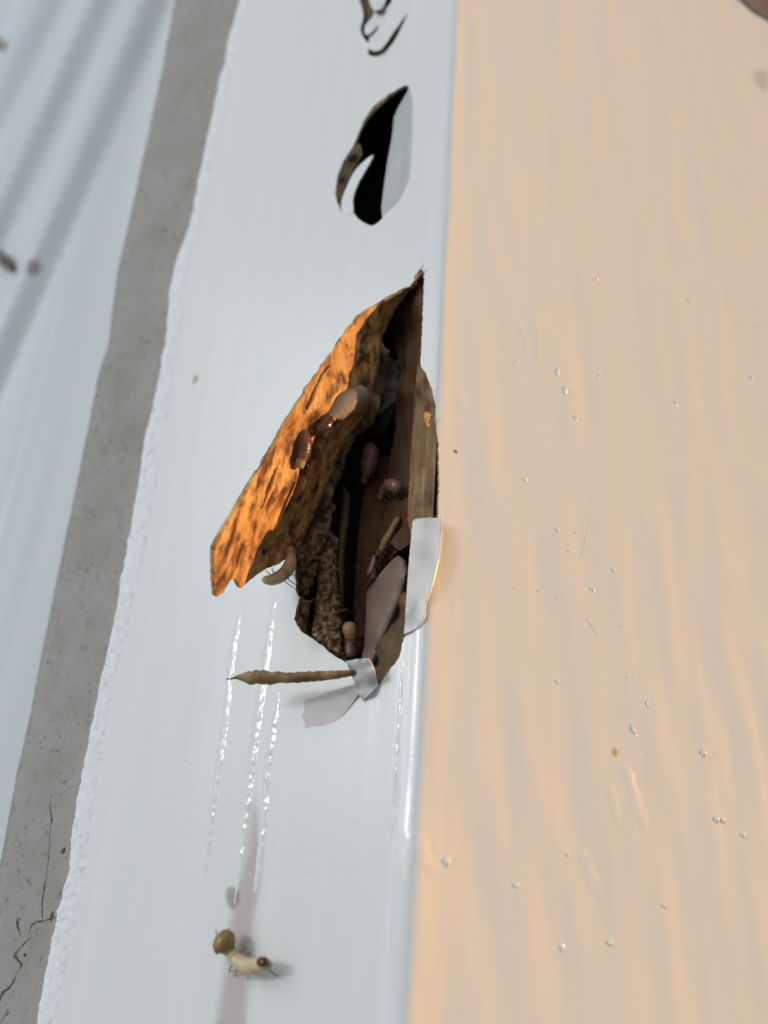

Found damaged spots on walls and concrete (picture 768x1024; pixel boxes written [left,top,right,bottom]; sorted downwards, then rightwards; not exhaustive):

peeling [381,89,413,218]
peeling [404,517,441,635]
peeling [346,658,379,701]
crack [0,795,57,1024]